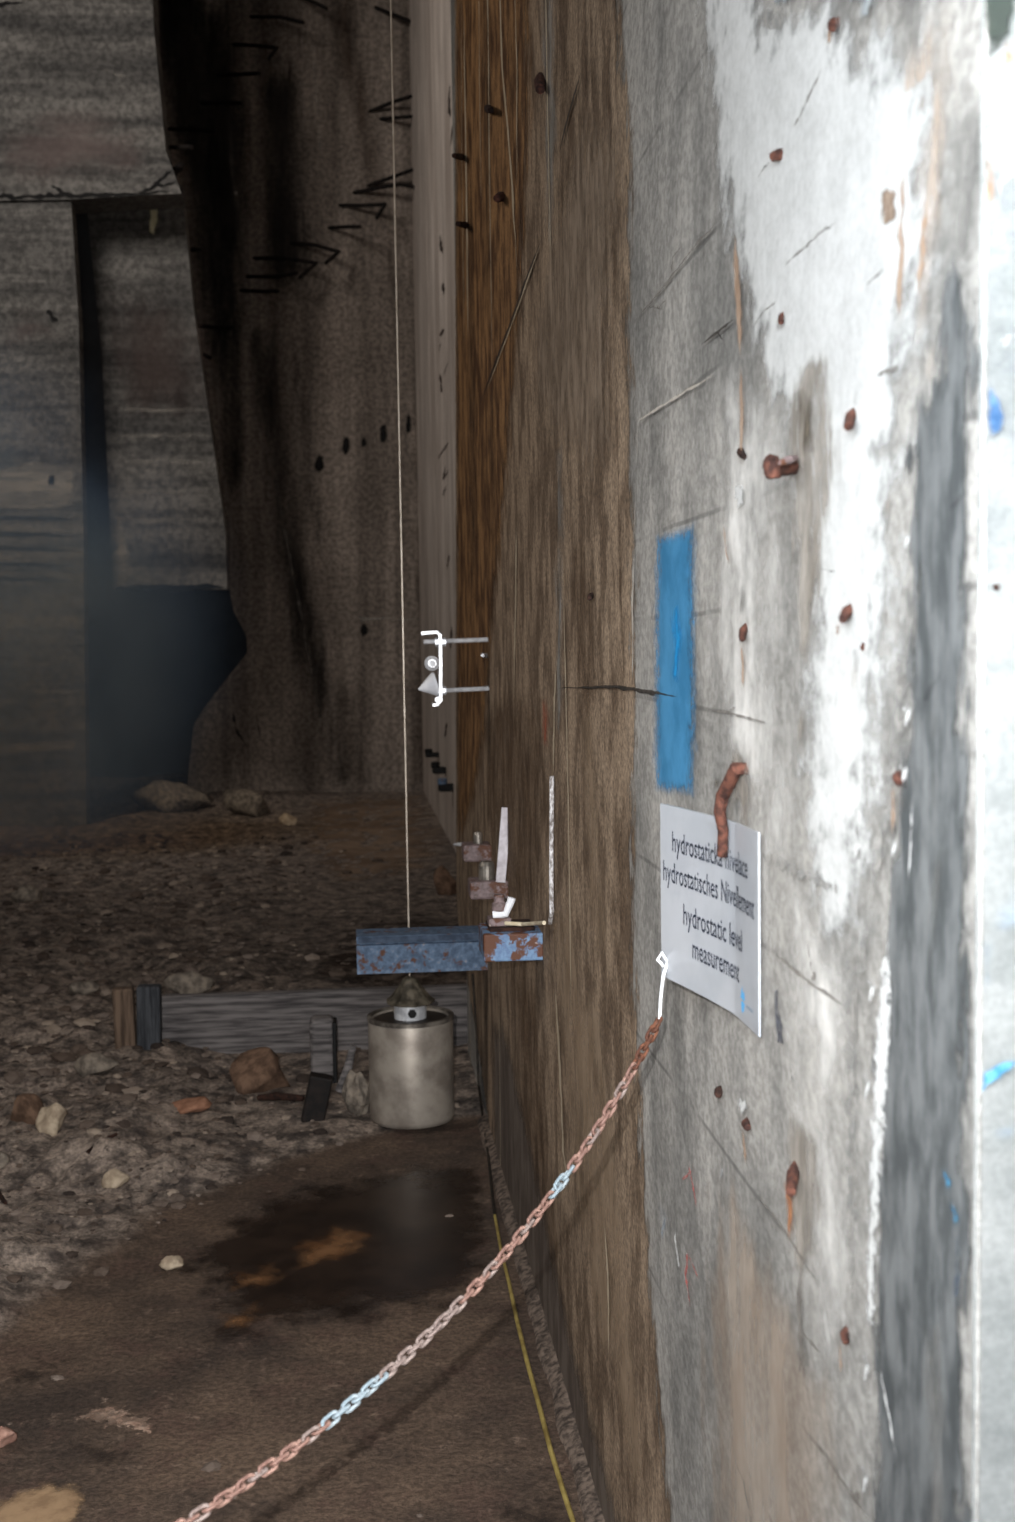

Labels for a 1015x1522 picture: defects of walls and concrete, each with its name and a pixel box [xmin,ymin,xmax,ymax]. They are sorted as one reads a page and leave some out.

damp [289,550,325,710]
damp [310,798,438,880]
damp [454,0,671,1522]
damp [319,934,375,983]